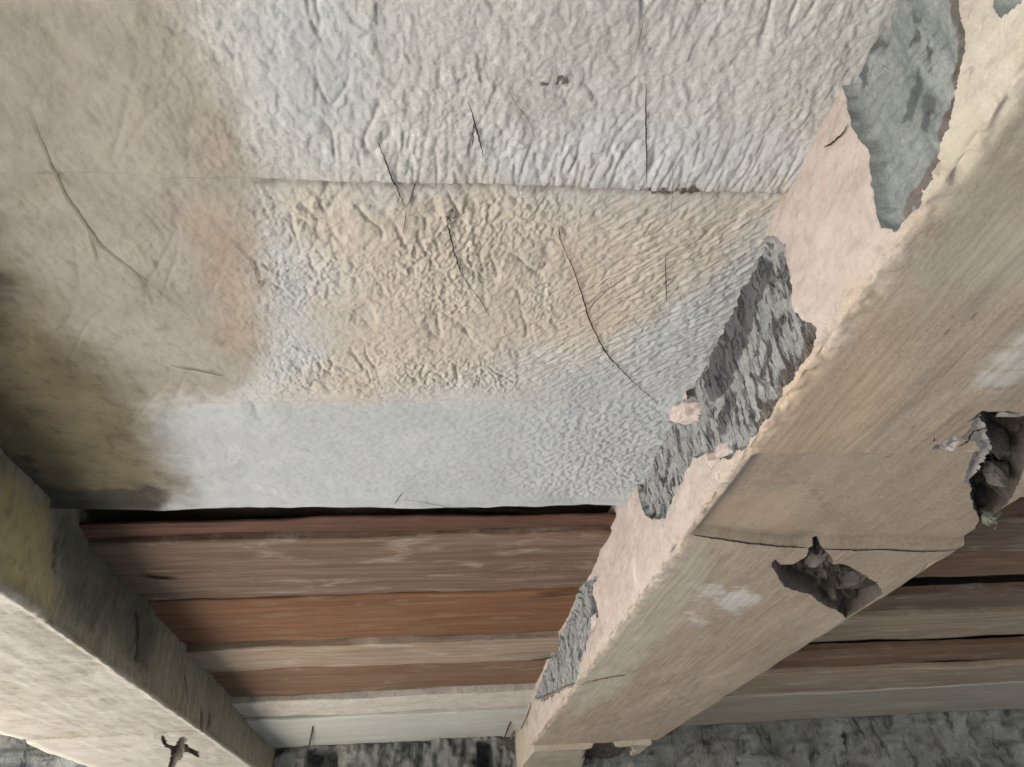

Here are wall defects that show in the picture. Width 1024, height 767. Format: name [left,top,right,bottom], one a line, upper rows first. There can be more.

peeling [842,0,966,232]
crack [25,106,185,313]
crack [378,143,416,233]
crack [446,215,489,315]
crack [558,224,656,402]
peeling [637,235,817,520]
spalling [932,411,1024,530]
peeling [535,575,599,702]
crack [693,534,951,552]
spalling [771,536,883,619]